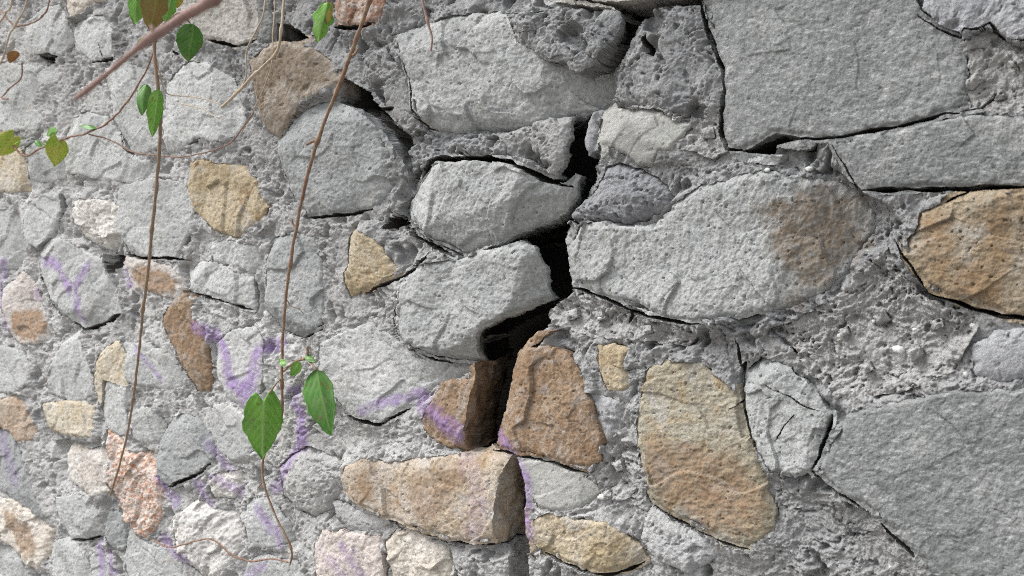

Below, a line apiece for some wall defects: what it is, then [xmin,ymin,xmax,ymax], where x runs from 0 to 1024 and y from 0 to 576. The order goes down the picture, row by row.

crack [701,0,725,70]
crack [719,95,1024,203]
crack [536,229,570,257]
crack [480,313,588,474]